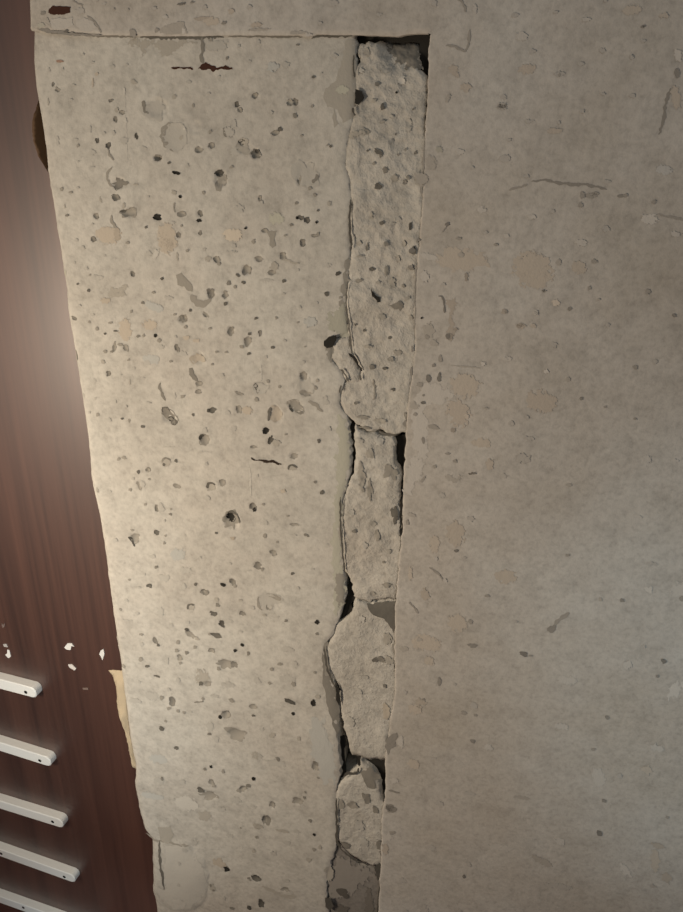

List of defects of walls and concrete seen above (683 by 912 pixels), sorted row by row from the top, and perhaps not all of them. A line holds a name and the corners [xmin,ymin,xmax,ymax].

corrosion [48,6,70,15]
corrosion [171,62,232,72]
spalling [323,39,357,128]
crack [348,199,364,257]
crack [339,281,376,400]
spalling [403,355,442,427]
crack [338,497,346,572]
crack [397,497,405,551]
spalling [367,601,396,663]
spalling [313,620,340,738]
spalling [385,733,398,755]
crack [335,768,368,865]